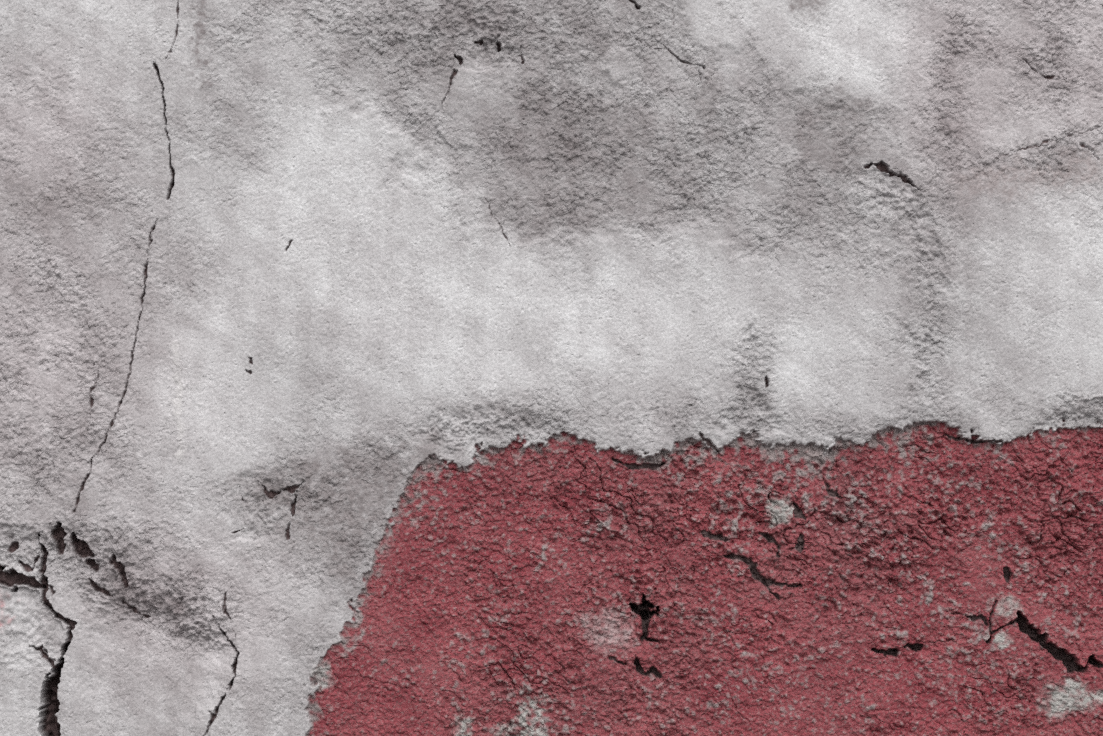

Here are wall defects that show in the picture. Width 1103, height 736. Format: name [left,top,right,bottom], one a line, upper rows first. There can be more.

crack [441,68,458,104]
crack [959,125,1103,171]
crack [71,0,180,514]
spalling [413,401,587,466]
peeling [763,492,794,530]
crack [28,532,77,736]
crack [202,591,240,736]
peeling [572,602,645,667]
peeling [981,592,1026,653]
crack [950,599,1103,675]
peeling [446,684,560,736]
peeling [1034,674,1103,727]